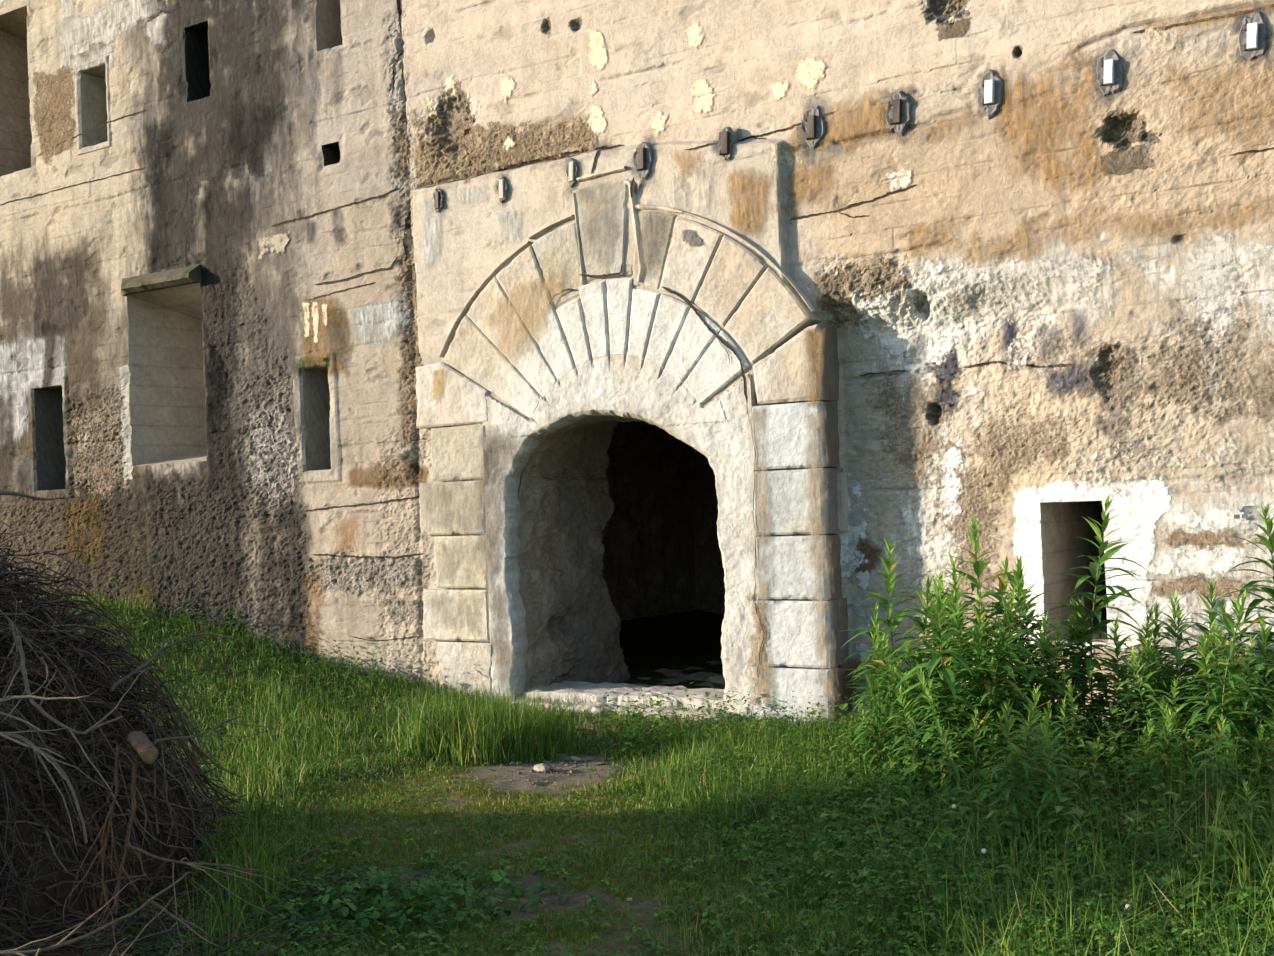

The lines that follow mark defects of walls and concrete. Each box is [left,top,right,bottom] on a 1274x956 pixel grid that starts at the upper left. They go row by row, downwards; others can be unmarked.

spalling [924,0,971,41]
leakage [392,205,400,231]
crack [271,0,623,333]
spalling [386,82,597,187]
crack [628,177,636,198]
rust [788,98,890,207]
crack [789,184,917,220]
rust [1002,76,1095,188]
spalling [1100,109,1160,176]
leakage [0,0,327,659]
spalling [369,246,423,484]
peeling [814,233,1274,662]